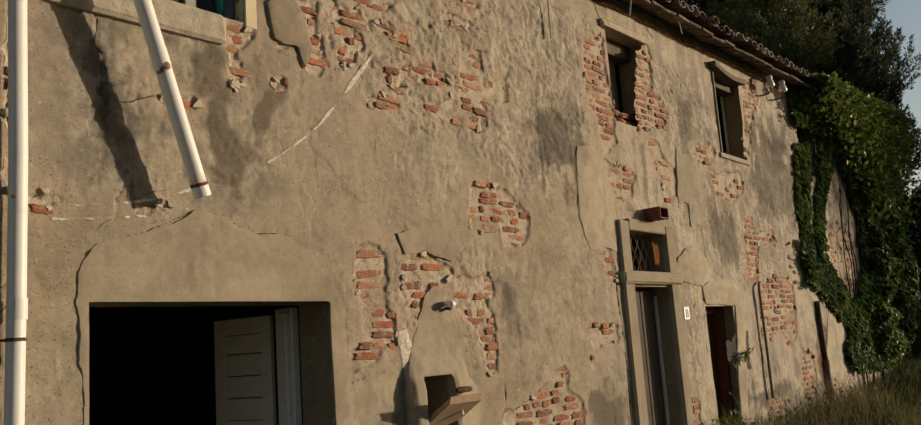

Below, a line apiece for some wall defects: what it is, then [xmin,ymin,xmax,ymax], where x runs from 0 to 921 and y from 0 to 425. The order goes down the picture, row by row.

flaking render [299,0,512,134]
leakage [528,105,584,181]
flaking render [582,32,636,202]
flaking render [633,44,677,203]
flaking render [468,180,532,248]
flaking render [349,242,403,374]
flaking render [400,251,499,377]
flaking render [503,366,586,425]
peeling [726,331,752,370]
flaking render [744,217,818,405]